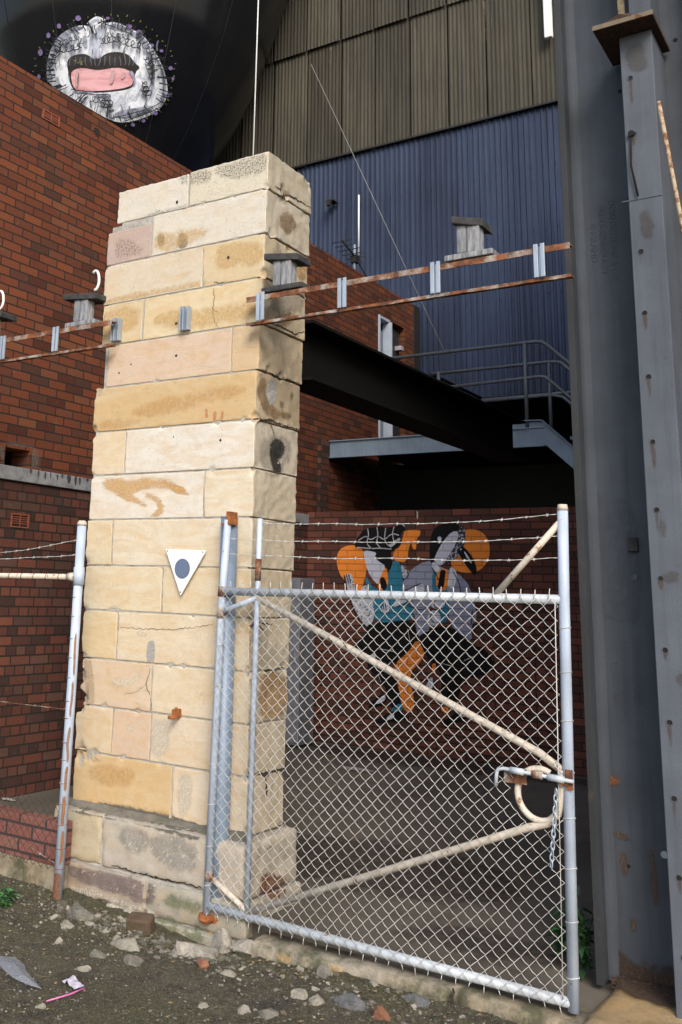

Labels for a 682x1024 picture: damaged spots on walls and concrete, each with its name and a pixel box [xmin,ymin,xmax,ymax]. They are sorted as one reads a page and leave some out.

crack [121,624,208,632]